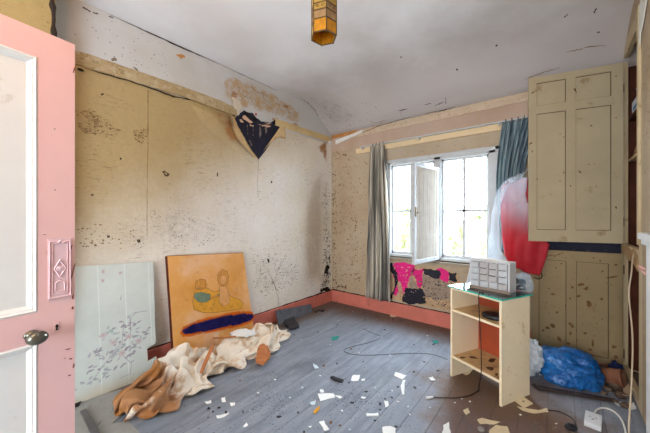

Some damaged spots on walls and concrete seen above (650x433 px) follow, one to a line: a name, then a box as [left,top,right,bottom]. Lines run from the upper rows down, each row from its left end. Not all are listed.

crack [84,68,190,103]
leakage [223,77,299,125]
leakage [300,170,352,293]
peeling [390,262,460,311]